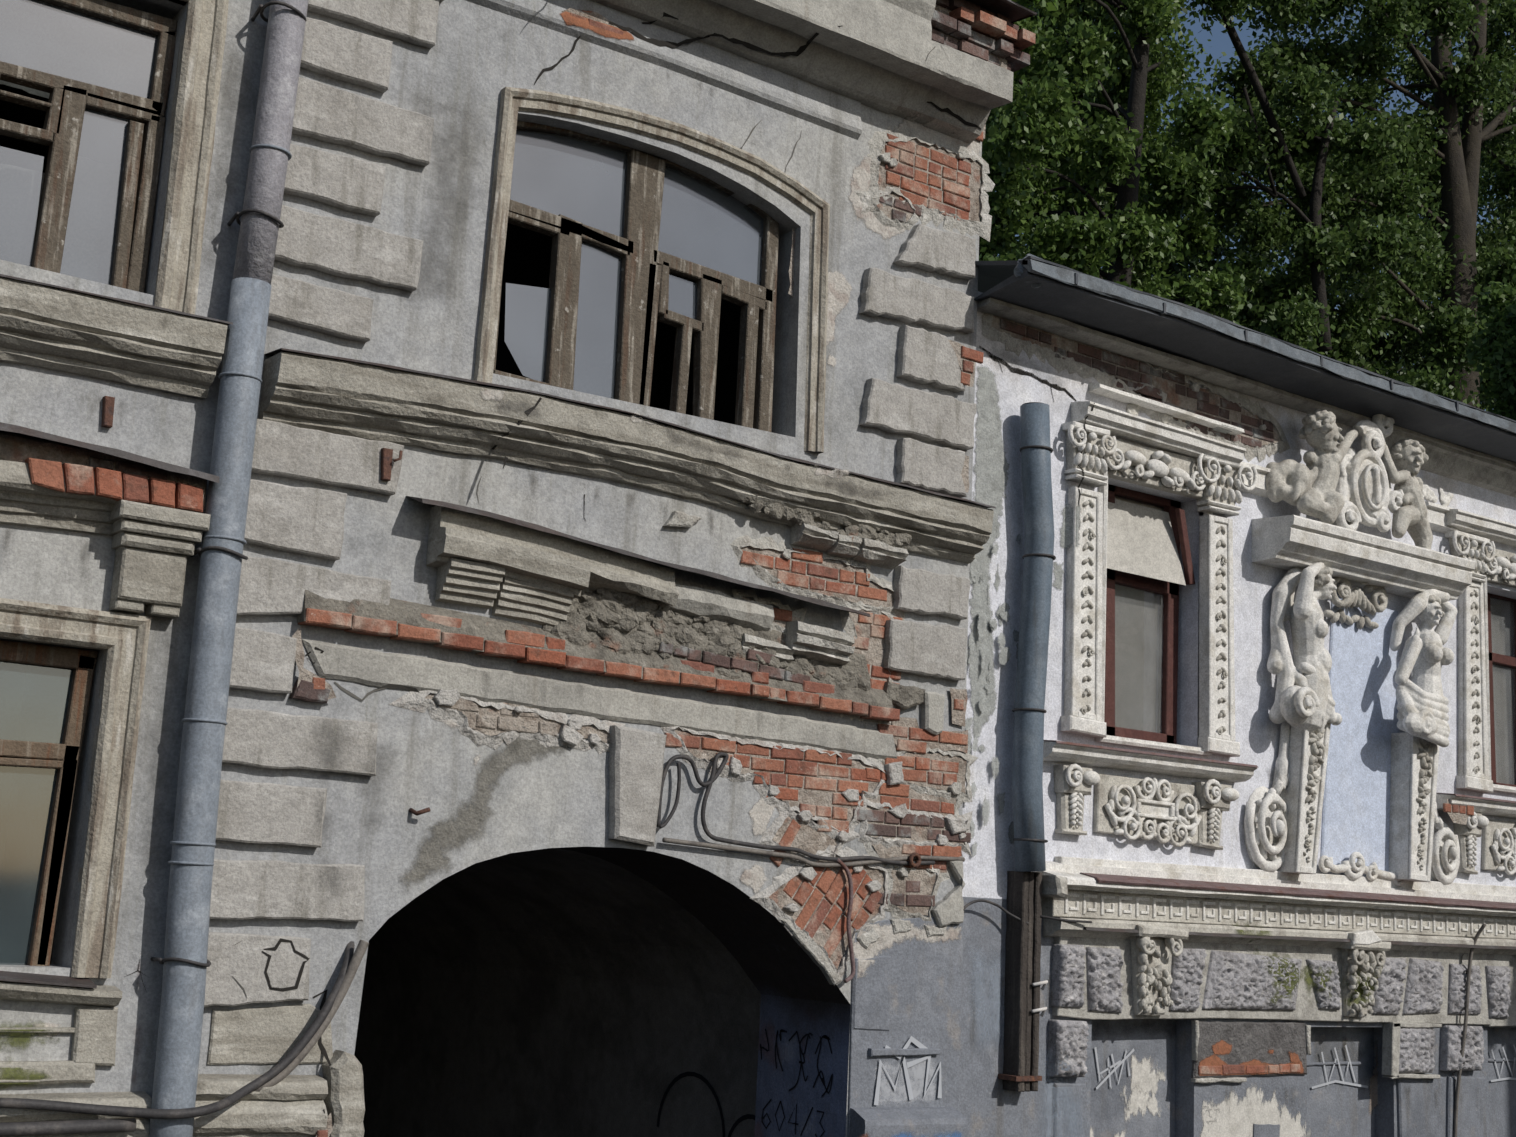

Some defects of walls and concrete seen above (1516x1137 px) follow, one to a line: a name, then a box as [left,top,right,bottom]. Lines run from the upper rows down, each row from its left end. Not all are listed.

crack [534,12,842,85]
spalling [849,114,995,242]
spalling [298,312,1290,978]
crack [232,938,332,1069]
spalling [1191,1020,1311,1083]